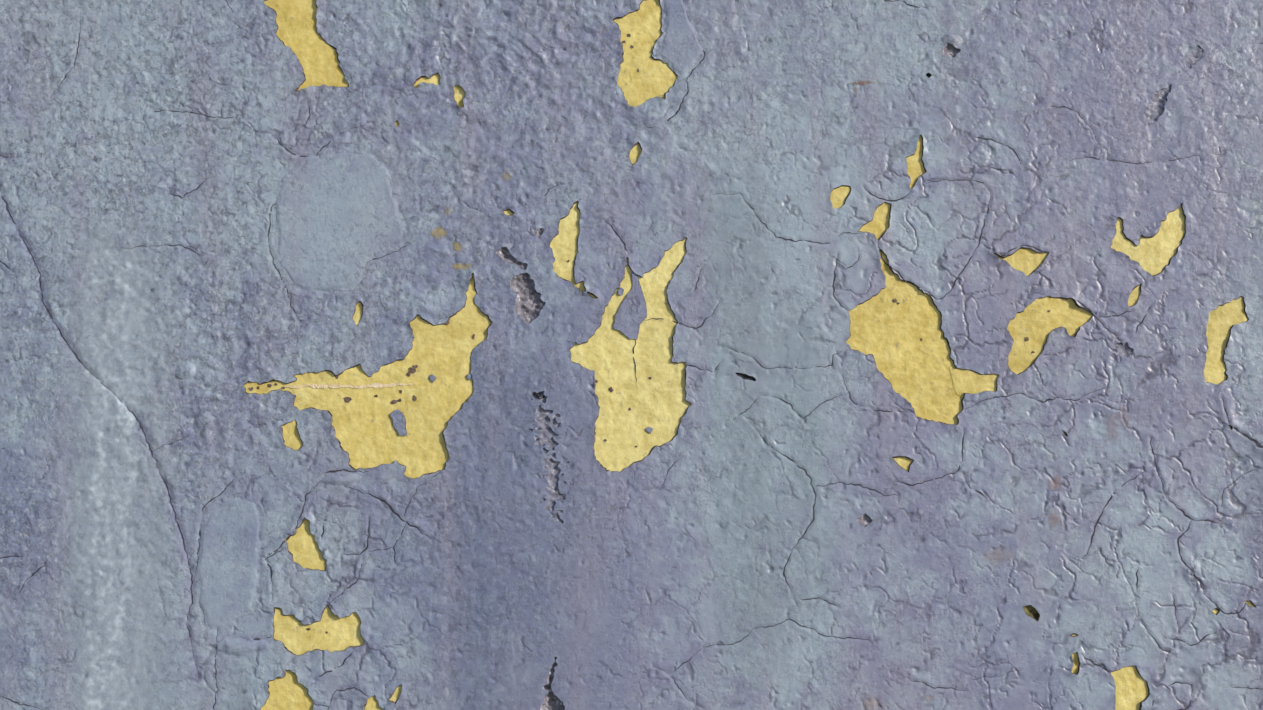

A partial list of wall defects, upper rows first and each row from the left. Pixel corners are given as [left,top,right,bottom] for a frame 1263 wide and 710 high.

peeling [264,0,349,92]
peeling [613,0,678,107]
crack [0,189,235,708]
crack [265,469,439,603]
peeling [243,273,493,479]
peeling [532,201,692,472]
crack [633,269,720,386]
crack [654,346,1108,708]
crack [716,136,1050,308]
peeling [846,202,1093,425]
peeling [1110,203,1186,307]
crack [1082,398,1263,710]